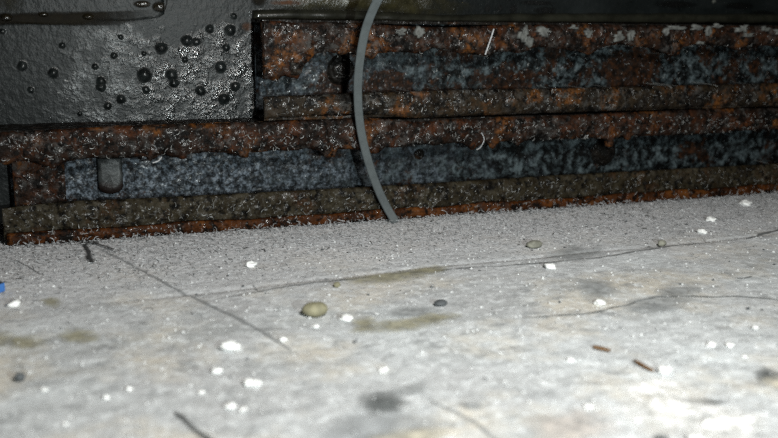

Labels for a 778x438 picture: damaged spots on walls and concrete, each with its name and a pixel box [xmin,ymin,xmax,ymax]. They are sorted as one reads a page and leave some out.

leakage [253,0,432,14]
corrosion [261,21,778,82]
corrosion [0,107,778,169]
corrosion [7,184,778,246]
crack [82,240,114,263]